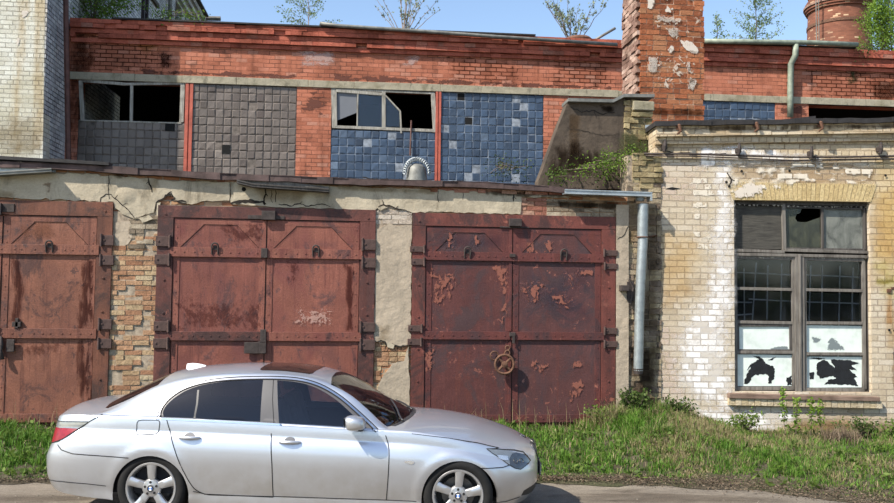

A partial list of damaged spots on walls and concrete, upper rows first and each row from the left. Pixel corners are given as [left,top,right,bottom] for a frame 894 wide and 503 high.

crack [100,175,186,219]
peeling [726,161,873,208]
spalling [128,202,161,249]
peeling [430,268,456,306]
peeling [492,265,509,324]
peeling [522,283,543,303]
spalling [374,342,407,390]